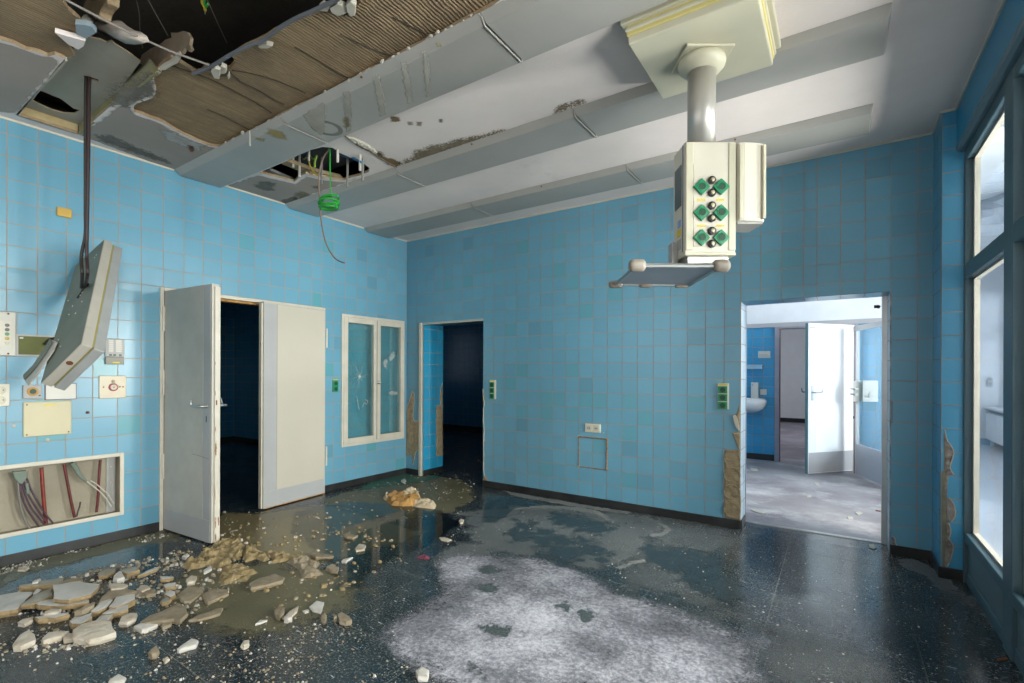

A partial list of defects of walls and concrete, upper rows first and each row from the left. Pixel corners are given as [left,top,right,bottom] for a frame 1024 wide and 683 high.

spalling [406,391,419,465]
spalling [723,407,741,521]
spalling [939,429,956,567]
water stain [385,492,756,683]